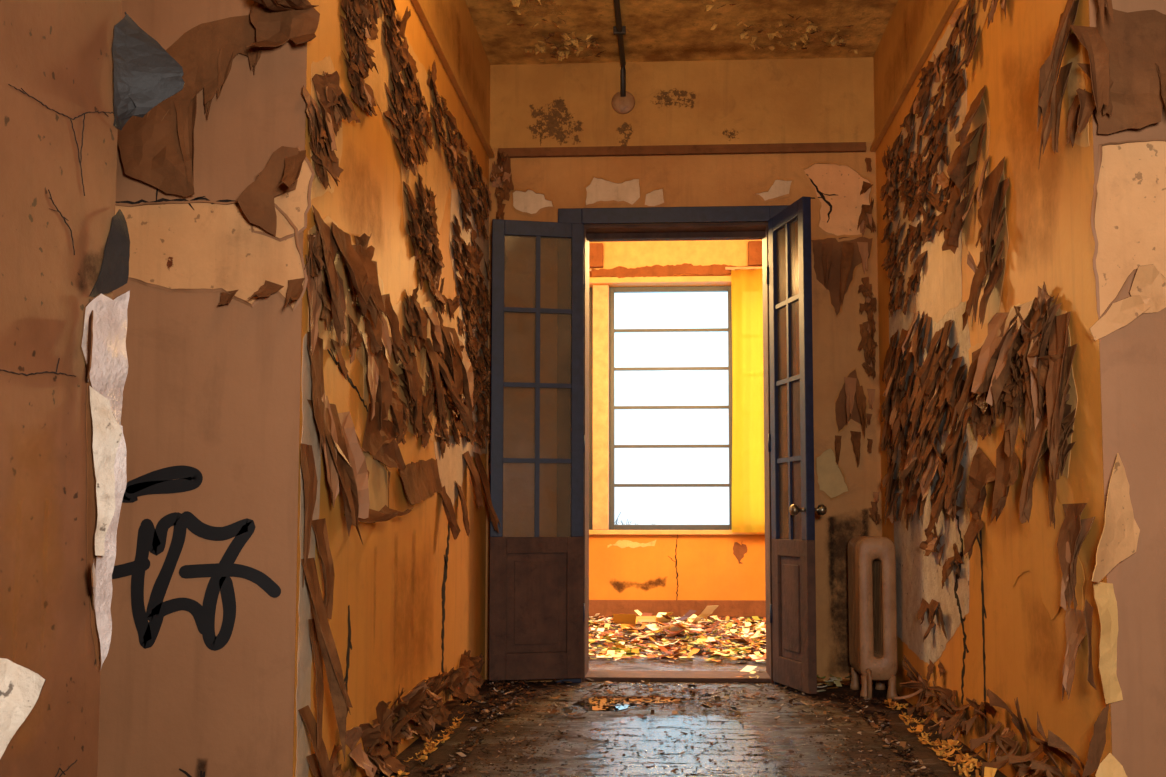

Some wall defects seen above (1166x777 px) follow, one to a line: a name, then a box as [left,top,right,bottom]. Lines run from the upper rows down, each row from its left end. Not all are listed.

crack [8,84,114,196]
crack [48,189,75,255]
spalling [528,99,582,145]
peeling [583,175,667,207]
spalling [654,88,696,108]
peeling [1037,0,1166,340]
peeling [80,0,555,777]
peeling [736,0,1140,777]